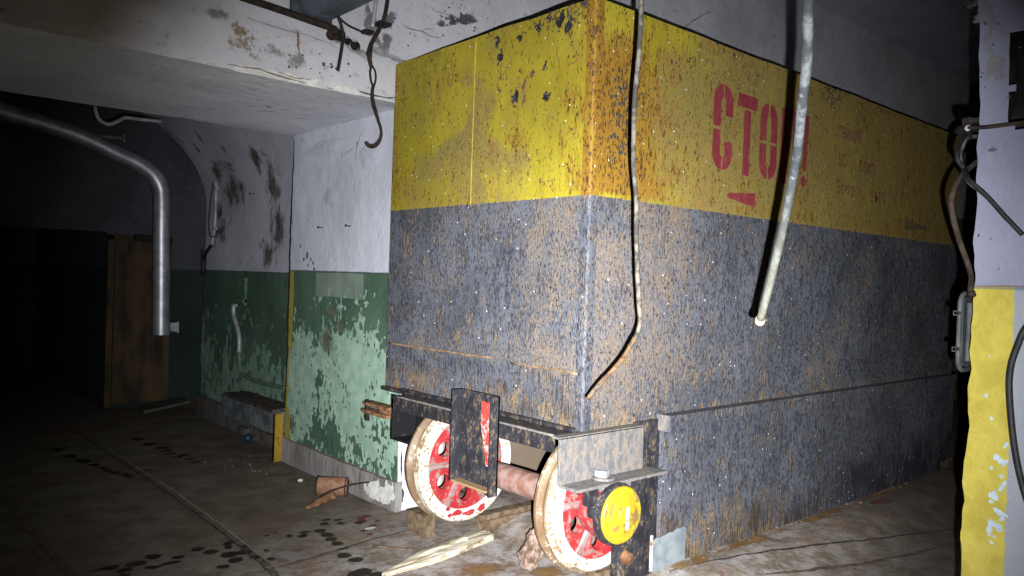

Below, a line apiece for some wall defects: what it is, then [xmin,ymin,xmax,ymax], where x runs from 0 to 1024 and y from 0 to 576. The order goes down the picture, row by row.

damp [213,147,246,239]
damp [250,147,283,266]
peeling [200,288,400,505]
peeling [986,442,1009,545]
rust [675,535,768,569]